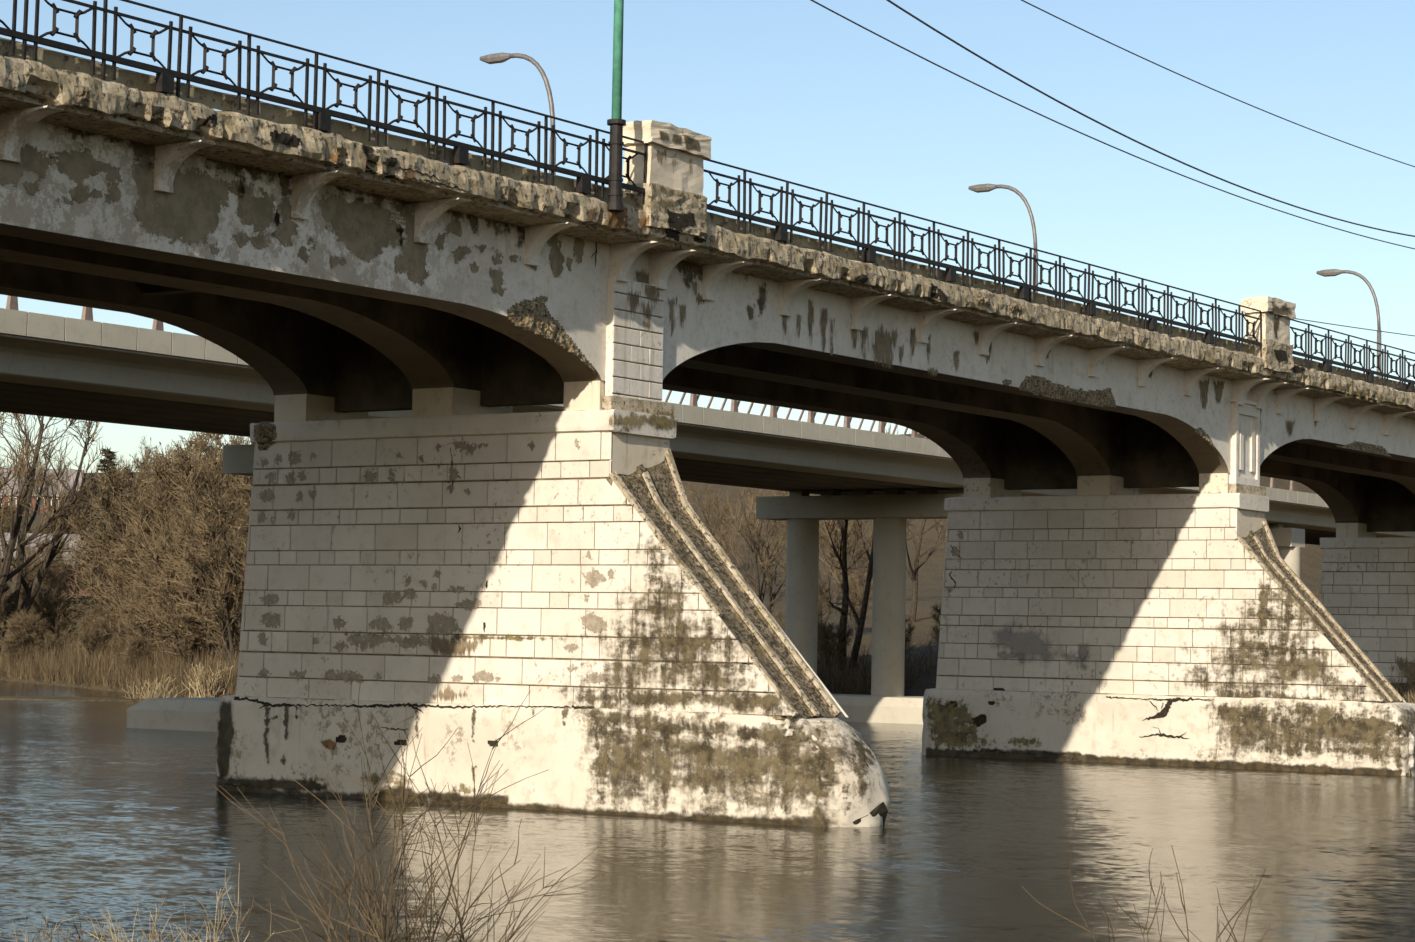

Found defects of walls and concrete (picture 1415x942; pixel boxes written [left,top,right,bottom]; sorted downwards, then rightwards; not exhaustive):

peeling [0,144,595,374]
spalling [1002,375,1116,408]
peeling [312,570,482,653]
water stain [618,555,750,672]
water stain [1242,584,1327,655]
water stain [429,637,483,657]
peeling [324,669,382,684]
peeling [427,670,500,684]
crack [234,697,595,735]
crack [1106,696,1214,739]
water stain [926,690,1414,776]
water stain [855,740,871,794]